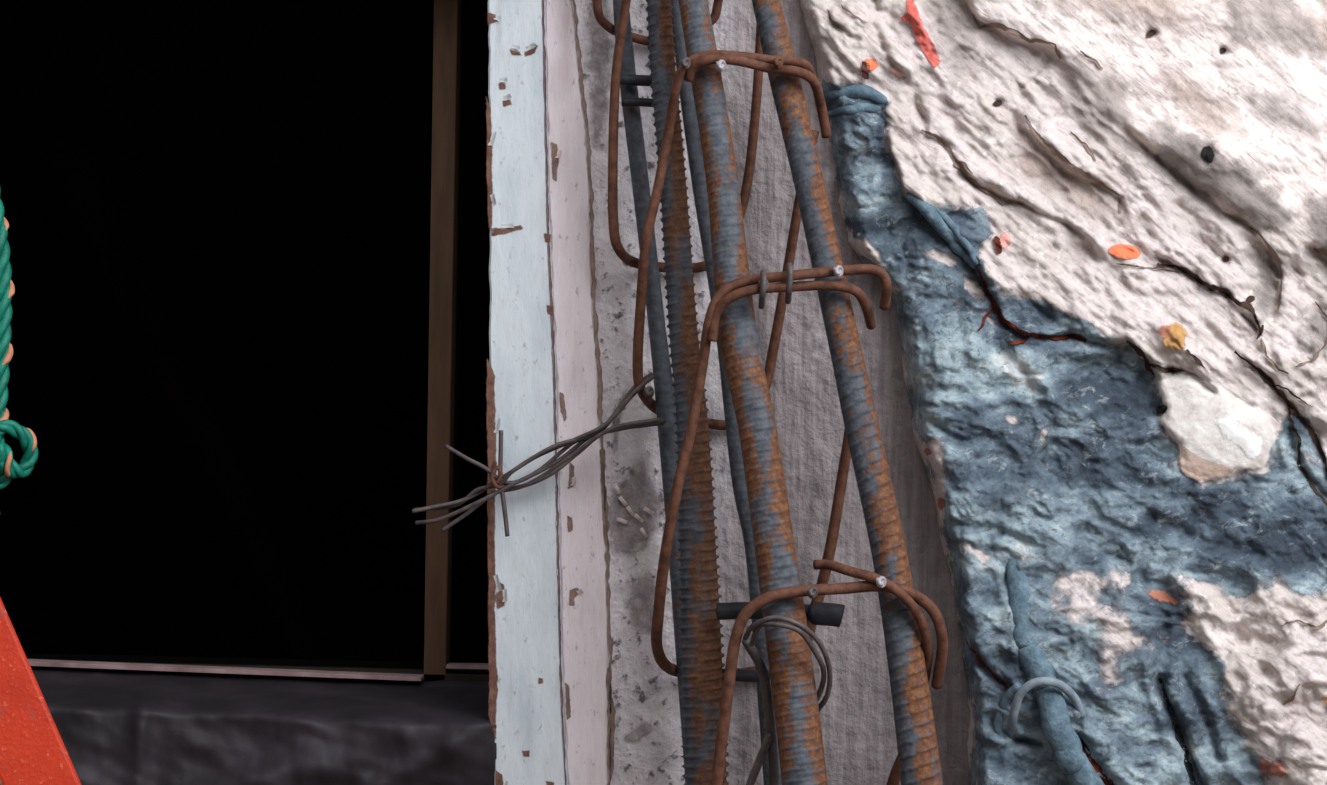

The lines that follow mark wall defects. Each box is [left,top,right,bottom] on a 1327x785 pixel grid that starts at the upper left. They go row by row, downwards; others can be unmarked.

peeling [510,43,538,56]
spalling [588,0,610,144]
peeling [486,77,523,236]
spalling [551,142,562,181]
spalling [1201,146,1214,163]
crack [976,269,1087,345]
spalling [806,321,834,371]
spalling [1156,371,1276,483]
spalling [609,462,660,554]
spalling [569,588,583,606]
spalling [629,578,654,631]
spalling [625,723,651,741]